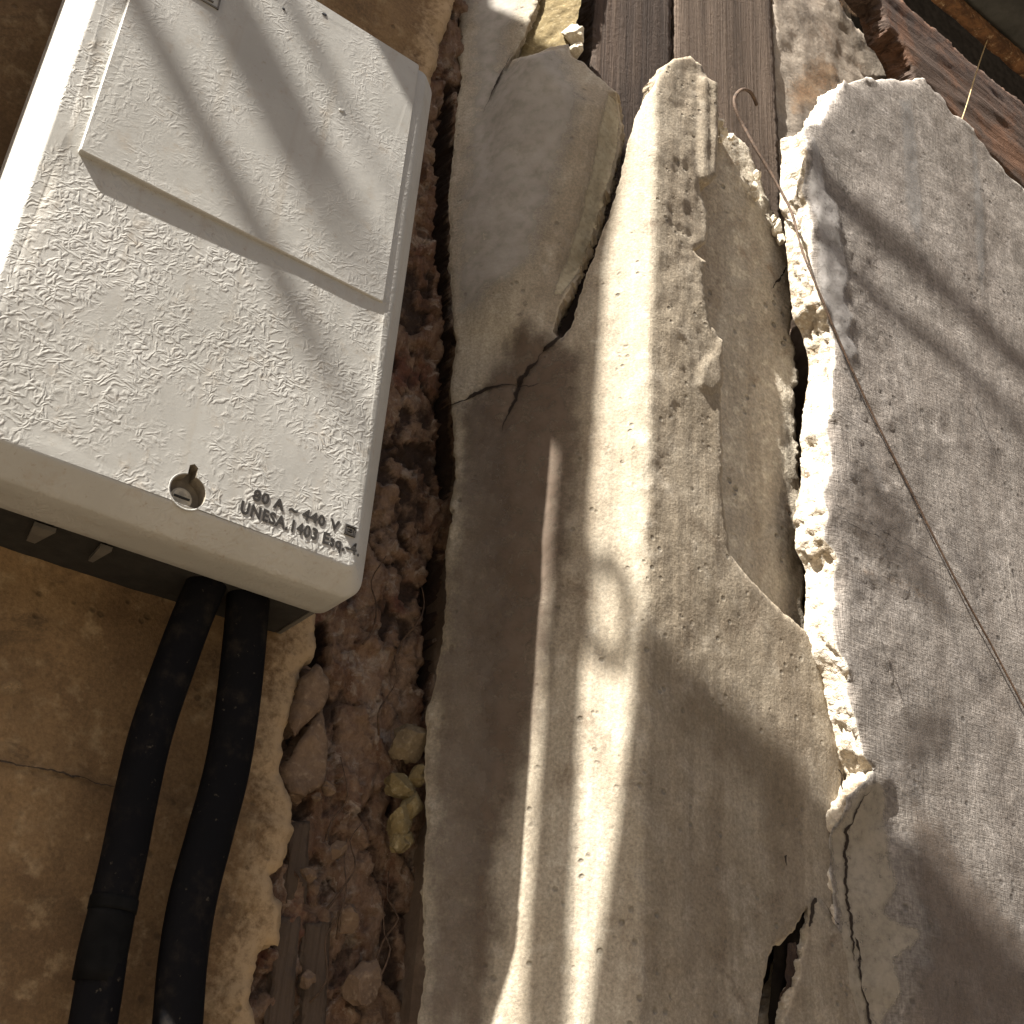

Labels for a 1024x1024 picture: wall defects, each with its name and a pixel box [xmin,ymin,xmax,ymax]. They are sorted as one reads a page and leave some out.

crack [450,155,625,430]
spalling [695,118,805,629]
peeling [808,139,857,357]
crack [809,769,872,1024]